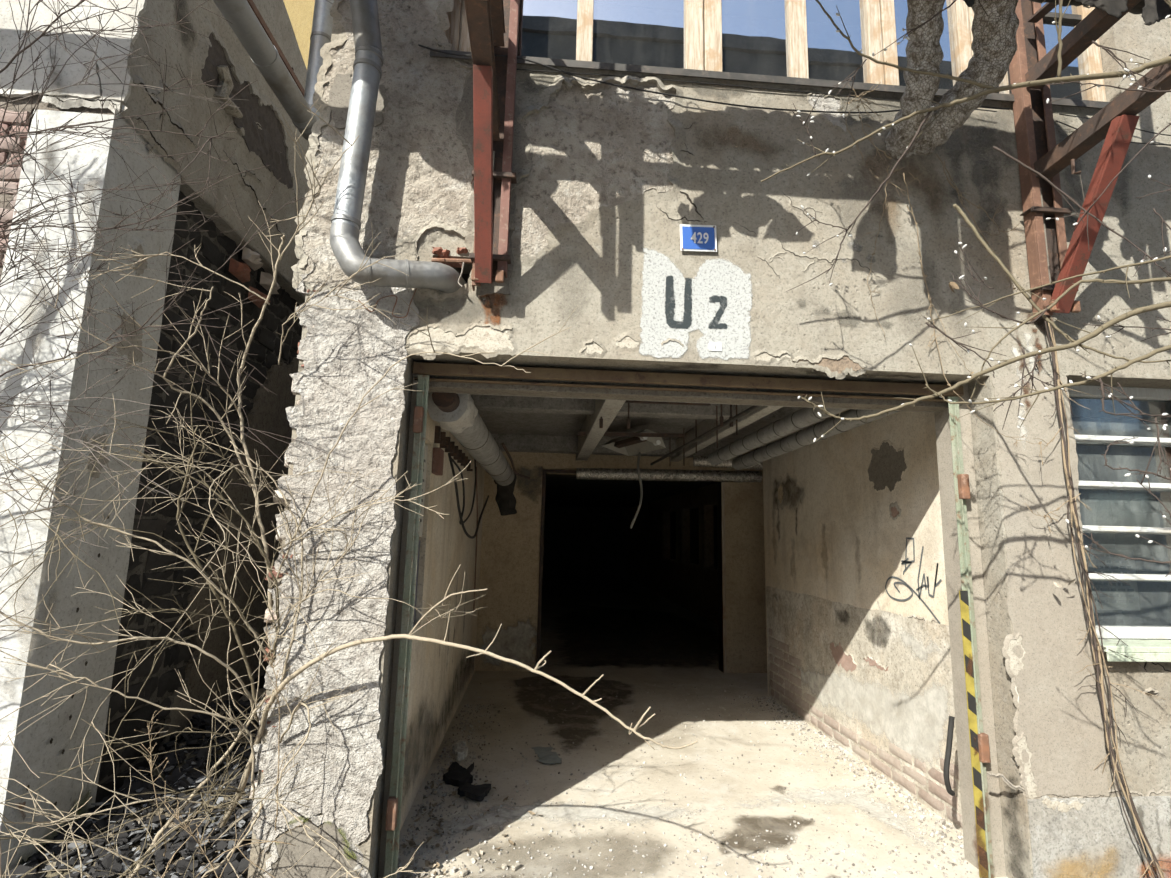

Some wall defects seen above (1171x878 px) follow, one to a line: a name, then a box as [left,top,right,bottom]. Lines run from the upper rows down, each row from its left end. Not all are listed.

water stain [840,92,901,125]
flaking render [189,0,362,308]
flaking render [359,0,474,303]
water stain [864,115,1011,240]
water stain [1063,161,1085,224]
flaking render [867,439,908,520]
spalling [265,528,293,581]
spalling [264,608,277,623]
water stain [403,607,719,794]
water stain [720,816,812,853]